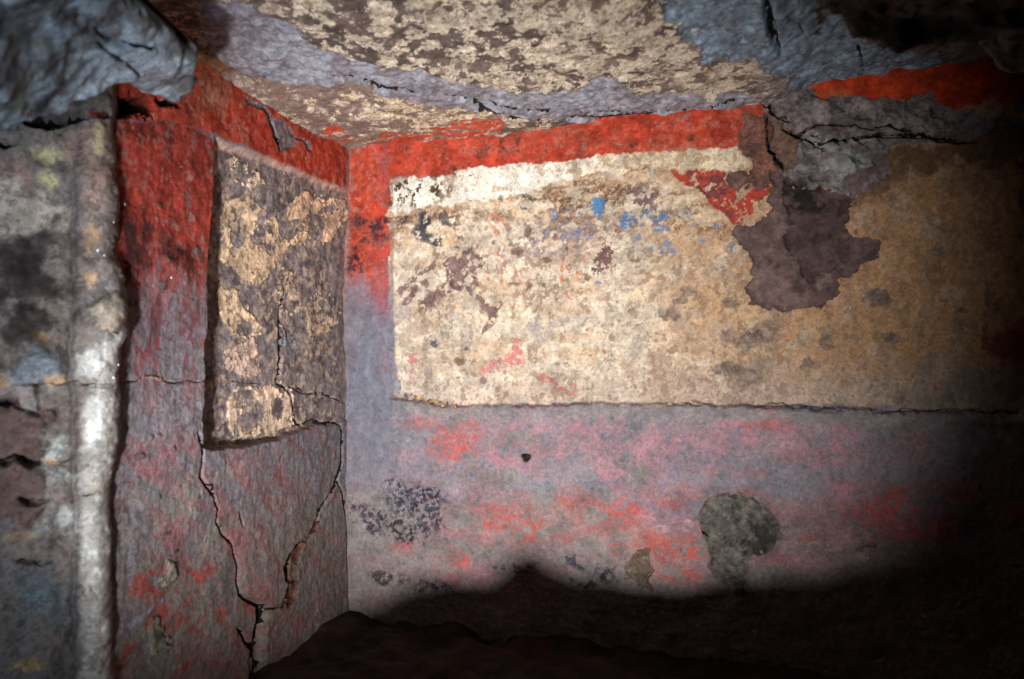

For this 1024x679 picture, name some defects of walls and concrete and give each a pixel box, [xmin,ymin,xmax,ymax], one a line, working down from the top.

crack [43,277,345,550]
peeling [217,156,349,440]
water stain [344,290,444,541]
spalling [197,0,956,353]
crack [765,104,977,171]
crack [203,483,279,677]
spalling [624,548,654,591]